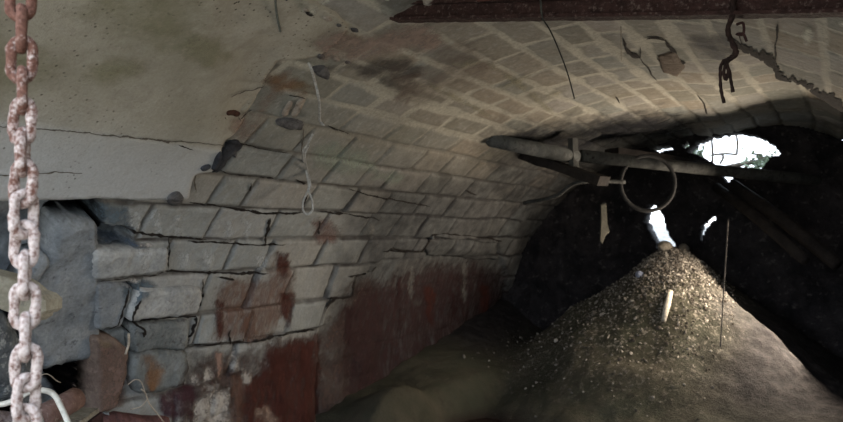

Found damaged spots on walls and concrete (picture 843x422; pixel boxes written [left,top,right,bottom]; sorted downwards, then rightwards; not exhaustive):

water stain [362,60,419,86]
crack [727,24,843,112]
crack [36,128,304,154]
corrosion [215,252,295,344]
crack [98,170,502,346]
corrosion [160,384,196,419]
corrosion [232,333,319,422]